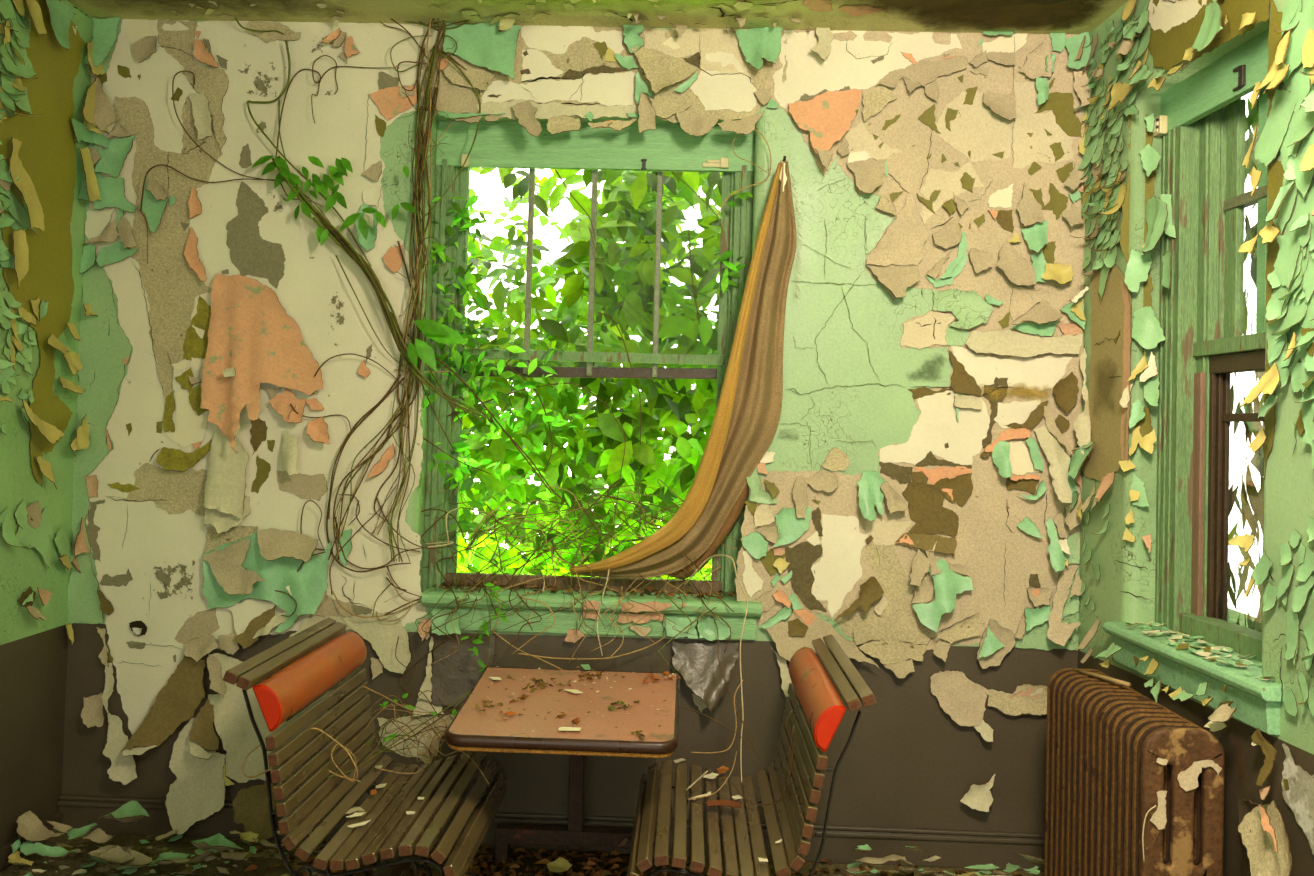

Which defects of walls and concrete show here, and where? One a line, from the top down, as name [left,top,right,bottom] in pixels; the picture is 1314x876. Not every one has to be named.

damp [920,0,1093,29]
flaking render [429,0,1314,717]
flaking render [0,0,461,846]
flaking render [930,670,1047,742]
peeling [1133,656,1237,733]
peeling [960,774,995,812]
peeling [1238,728,1314,876]